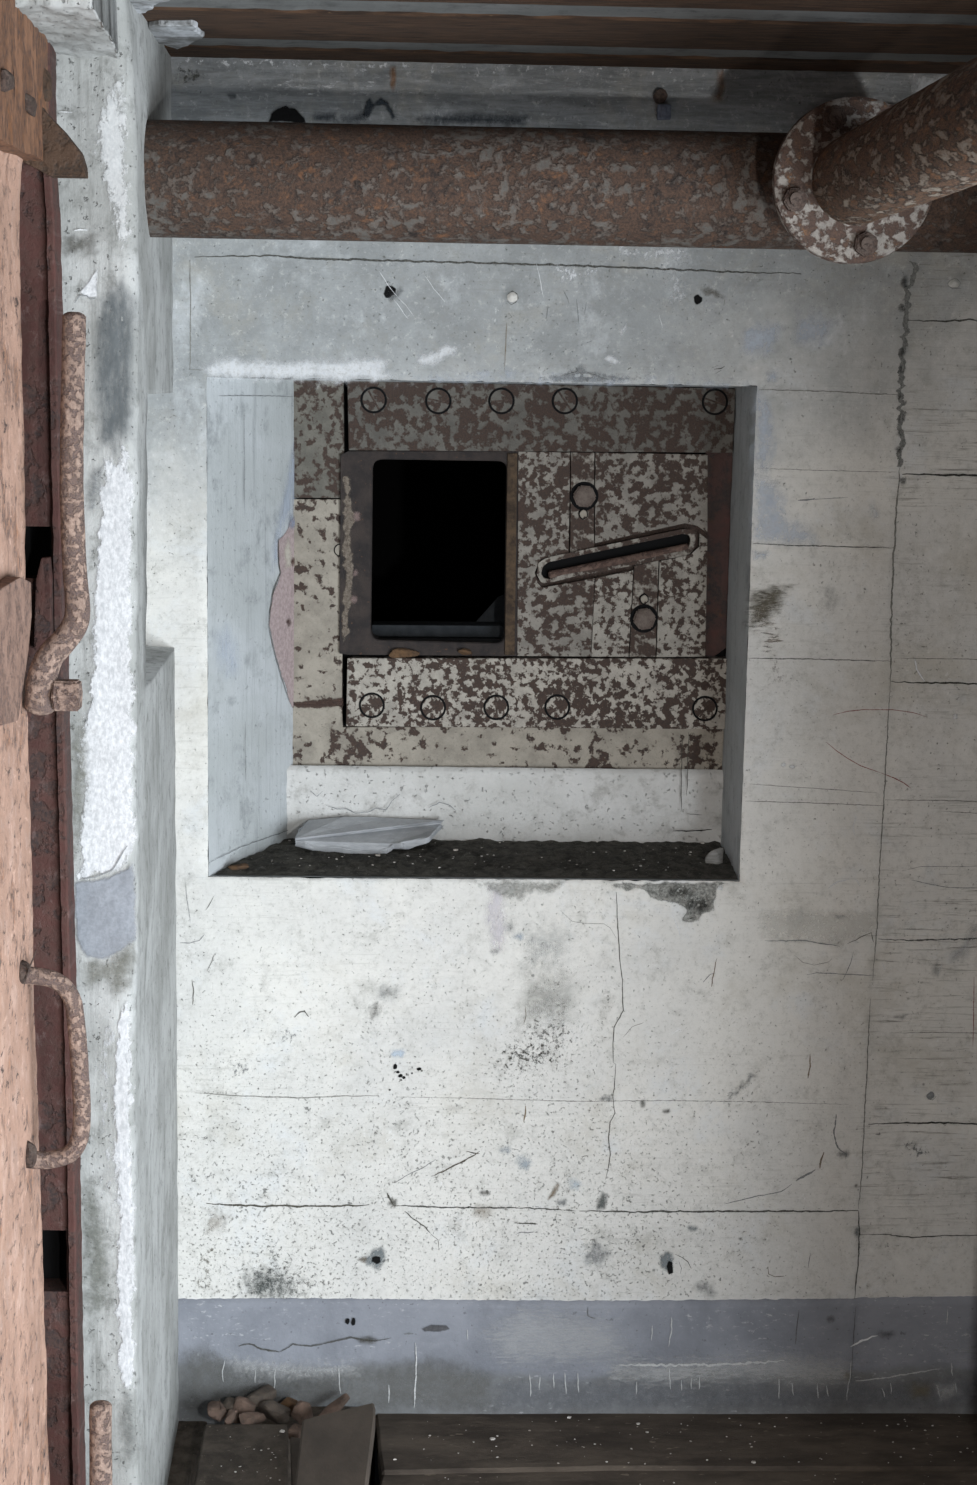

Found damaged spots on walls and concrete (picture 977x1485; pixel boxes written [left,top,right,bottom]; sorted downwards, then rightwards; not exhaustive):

rust [293,698,343,708]
spalling [612,849,724,922]
crack [560,893,642,1180]
crack [240,1336,389,1352]